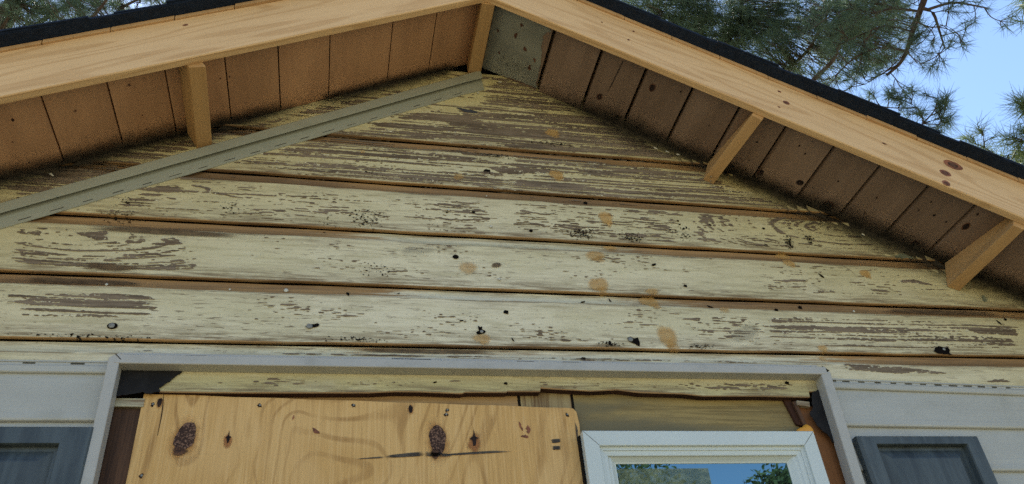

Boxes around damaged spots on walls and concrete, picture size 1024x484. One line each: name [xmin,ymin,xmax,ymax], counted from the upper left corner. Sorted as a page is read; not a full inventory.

peeling [102,6,878,250]
peeling [0,140,195,200]
peeling [12,228,196,270]
peeling [315,243,424,274]
peeling [759,265,834,293]
peeling [847,269,959,297]
peeling [7,293,164,318]
peeling [248,296,364,325]
peeling [374,310,480,338]
peeling [510,325,587,341]
rust [659,328,676,346]
peeling [603,309,1019,348]